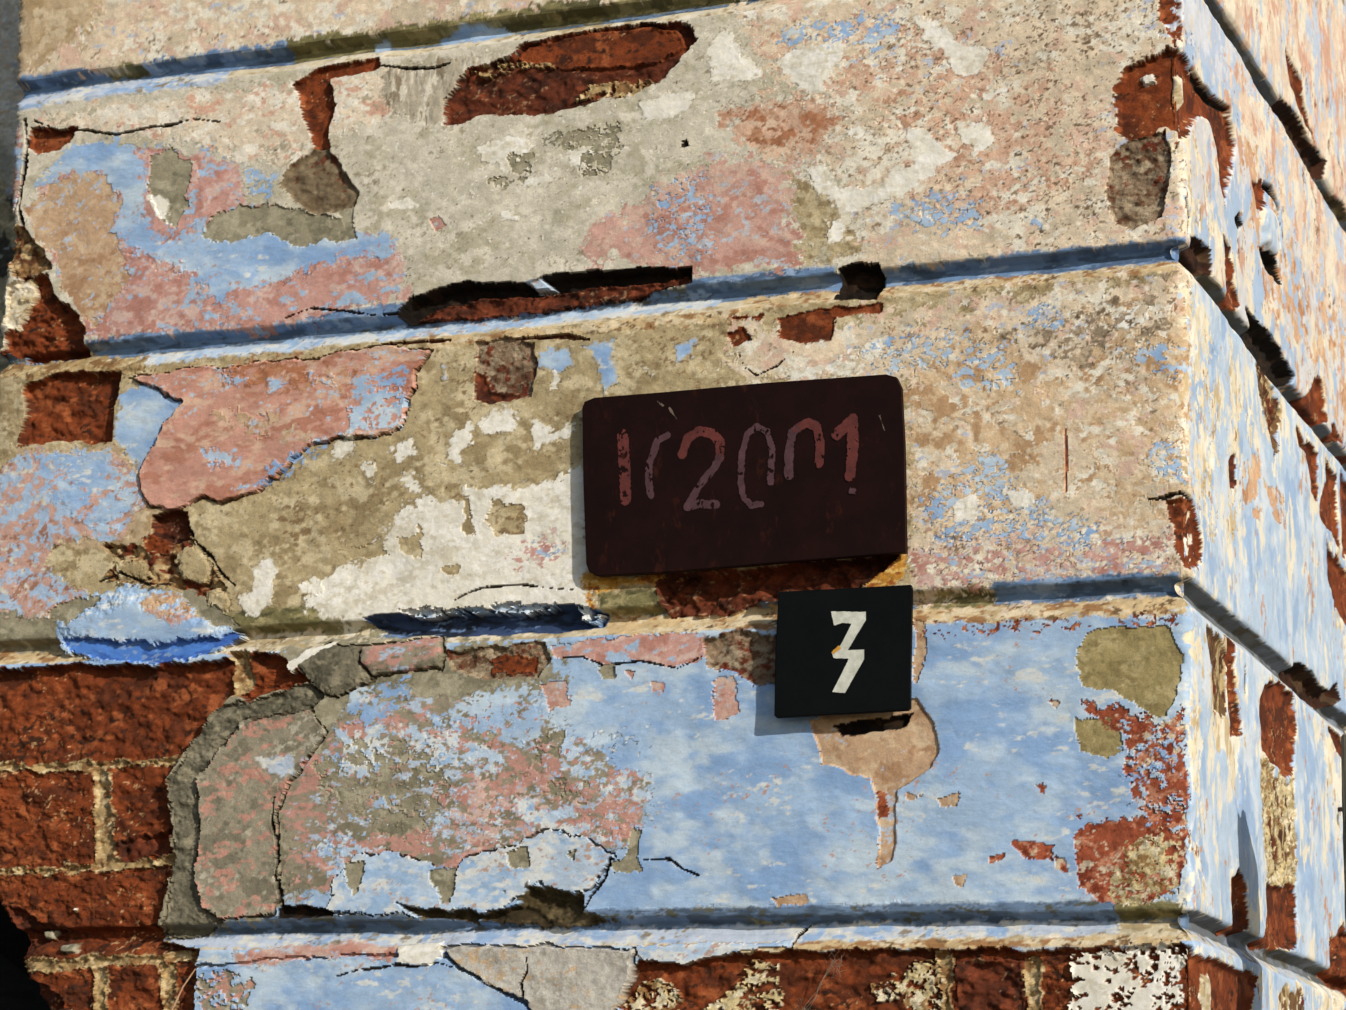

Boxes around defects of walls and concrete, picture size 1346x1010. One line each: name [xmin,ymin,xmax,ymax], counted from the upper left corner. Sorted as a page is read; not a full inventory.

spalling [440,6,1008,125]
peeling [808,117,996,244]
spalling [1105,0,1237,230]
peeling [0,37,718,619]
crack [273,796,284,902]
peeling [0,438,1259,1010]
spalling [1215,662,1341,951]
peeling [1278,983,1305,1010]